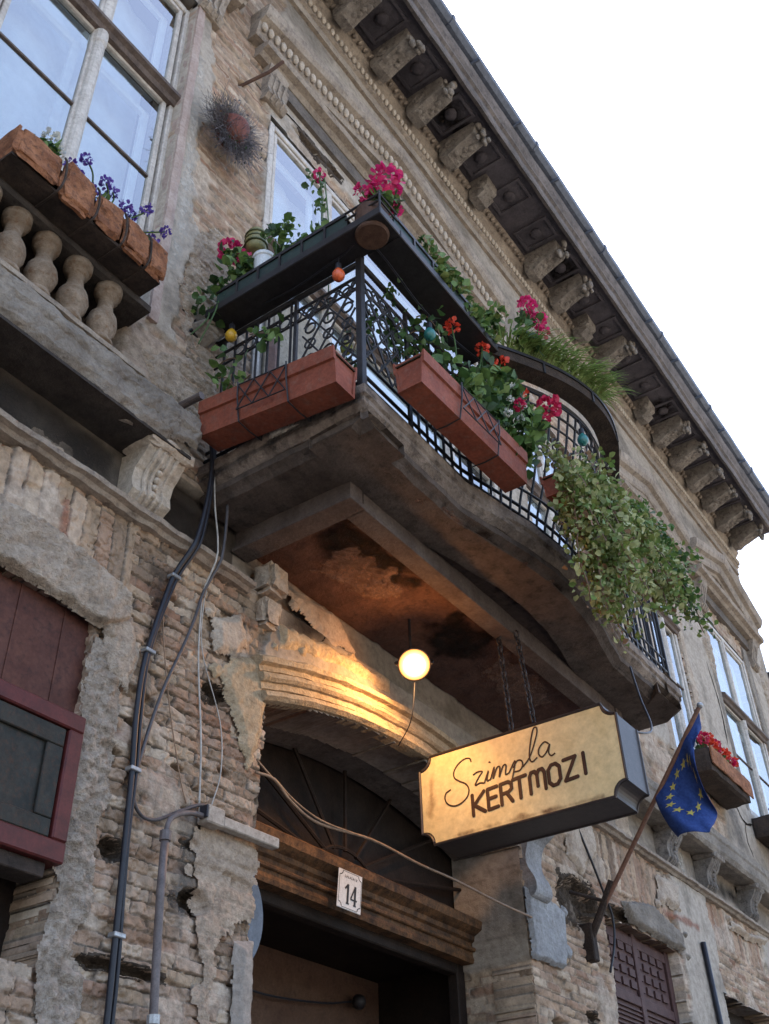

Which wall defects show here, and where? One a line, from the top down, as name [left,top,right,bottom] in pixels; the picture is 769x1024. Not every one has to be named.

leakage [319,520,420,587]
leakage [292,614,321,638]
leakage [429,612,496,660]
flaking render [200,607,266,771]
peeling [615,816,632,837]
spalling [167,863,196,918]
peeling [524,826,698,969]
hole [585,1010,600,1024]